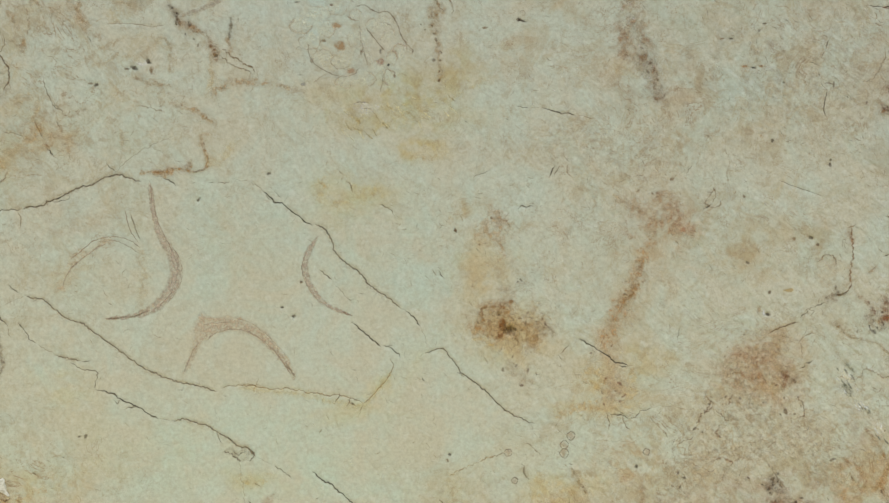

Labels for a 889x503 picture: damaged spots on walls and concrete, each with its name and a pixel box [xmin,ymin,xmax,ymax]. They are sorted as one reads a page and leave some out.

crack [0,165,135,211]
crack [266,193,418,324]
crack [59,356,254,454]
crack [13,289,400,405]
crack [432,348,529,423]